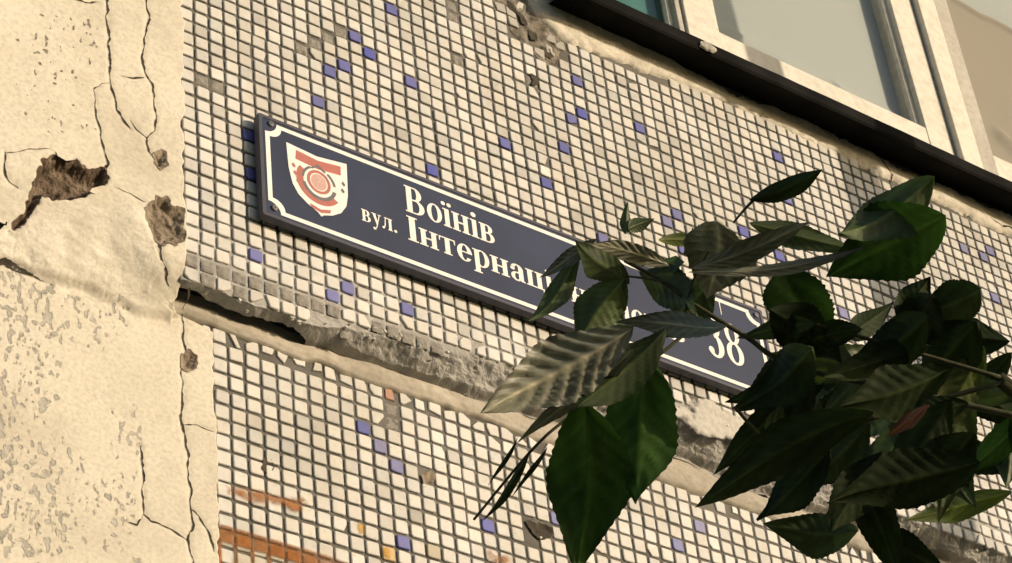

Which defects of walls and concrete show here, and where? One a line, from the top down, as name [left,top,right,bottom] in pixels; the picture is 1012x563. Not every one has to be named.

spalling [492,0,562,66]
crack [78,0,157,202]
crack [4,148,48,188]
flaking render [7,151,110,232]
spalling [145,195,532,402]
crack [129,242,214,563]
spalling [673,401,732,478]
rust [236,489,304,511]
rust [218,525,333,563]
spalling [526,520,554,540]
spalling [800,483,835,514]
spalling [897,504,1012,563]